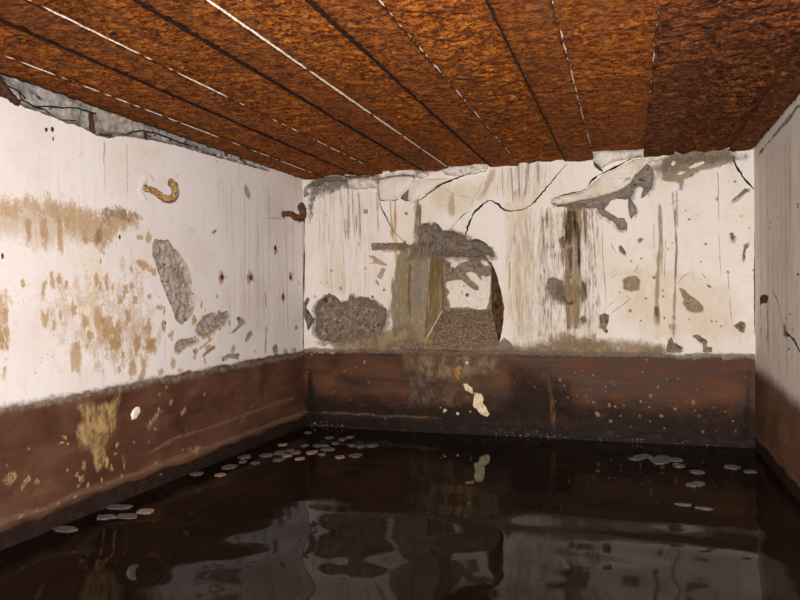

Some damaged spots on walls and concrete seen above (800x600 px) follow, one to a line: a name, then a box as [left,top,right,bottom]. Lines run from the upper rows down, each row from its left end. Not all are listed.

spalling [0,74,270,172]
flaking render [152,239,253,355]
flaking render [295,293,390,348]
water stain [340,187,361,244]
flaking render [369,222,496,286]
crack [340,156,643,241]
water stain [456,90,540,197]
flaking render [551,148,732,230]
crack [732,156,754,189]
crack [754,241,800,352]
water stain [0,198,800,551]